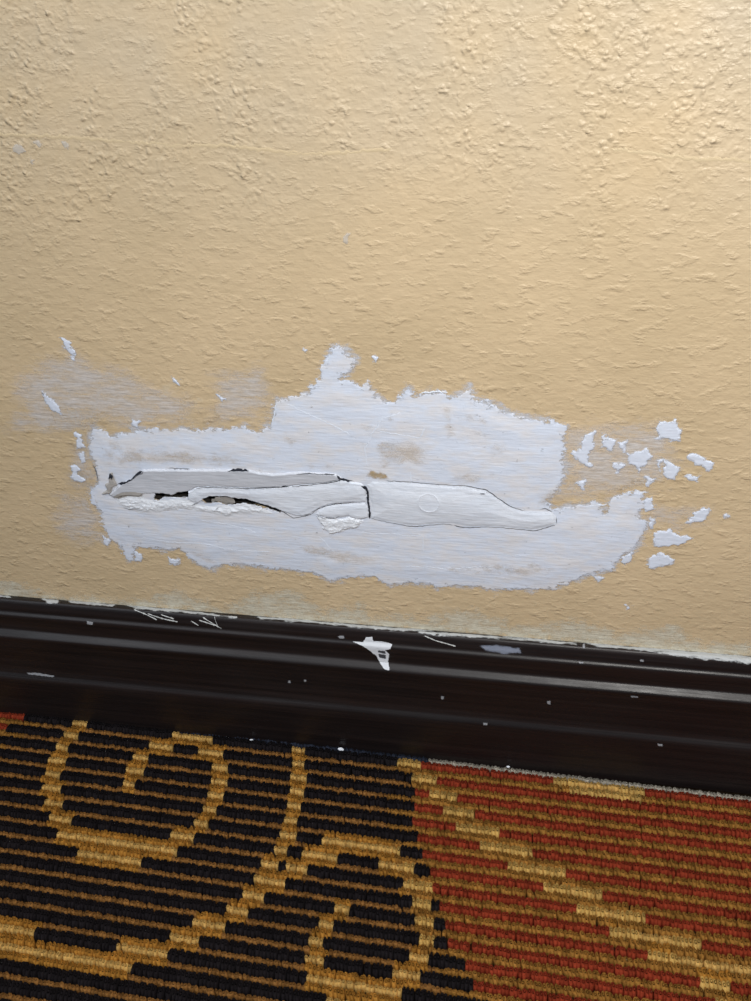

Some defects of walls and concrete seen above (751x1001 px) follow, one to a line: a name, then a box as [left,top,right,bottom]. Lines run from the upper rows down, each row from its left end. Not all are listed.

peeling [59,337,76,361]
peeling [655,419,682,442]
peeling [69,431,86,483]
crack [93,466,143,510]
peeling [109,469,369,535]
crack [174,468,557,531]
peeling [570,430,714,569]
peeling [101,535,143,562]